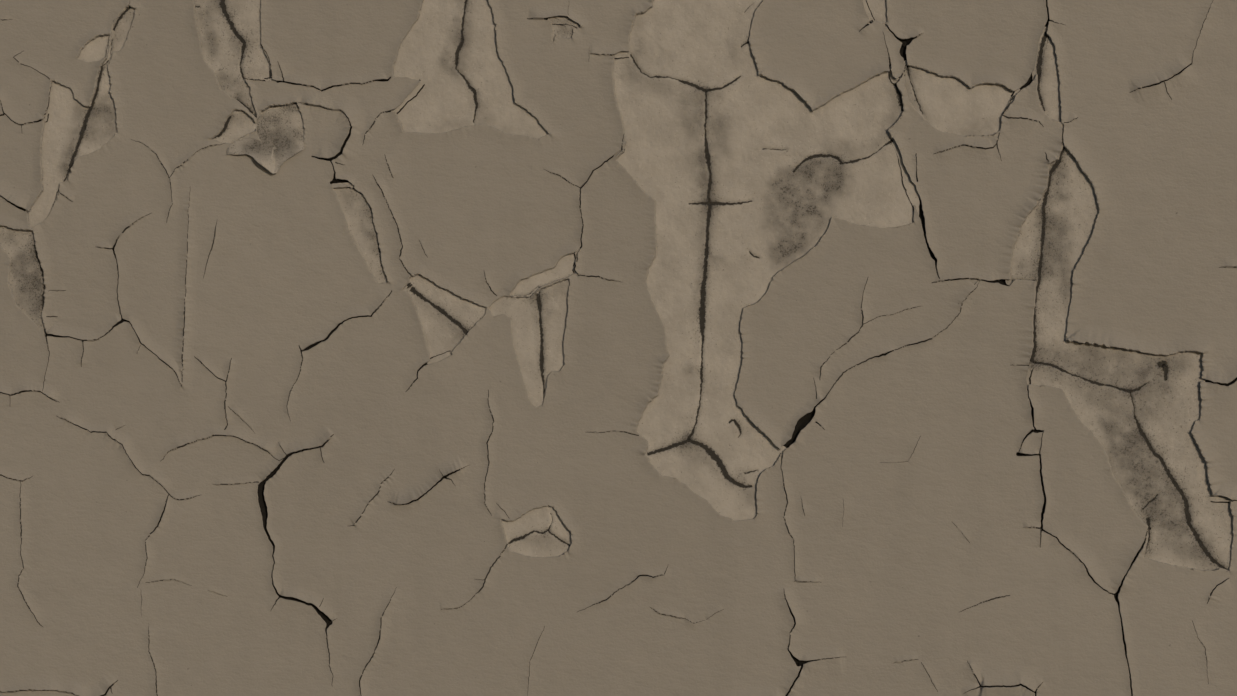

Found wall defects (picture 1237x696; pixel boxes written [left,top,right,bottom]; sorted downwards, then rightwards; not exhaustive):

crack [0,52,52,129]
peeling [0,0,143,332]
crack [0,139,410,696]
crack [243,44,425,143]
peeling [187,0,588,407]
crack [441,390,510,610]
crack [544,135,625,282]
crack [578,567,724,620]
crack [721,0,1078,696]
peeling [604,0,1237,575]
crack [1010,360,1151,696]
crack [1205,357,1237,404]